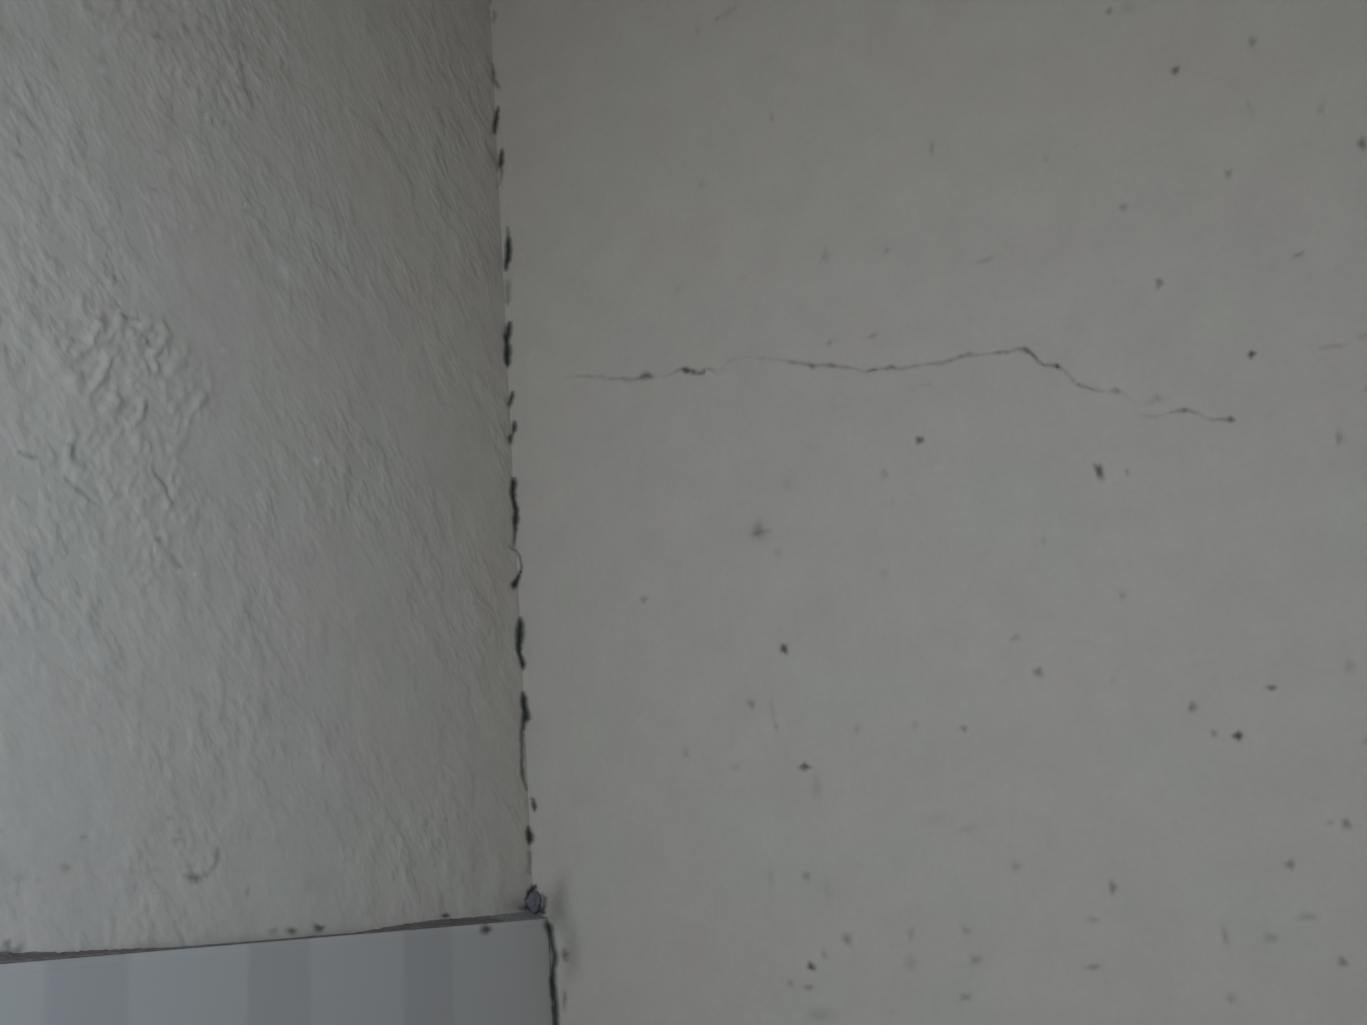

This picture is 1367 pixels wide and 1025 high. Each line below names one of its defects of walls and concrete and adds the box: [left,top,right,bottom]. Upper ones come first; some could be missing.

crack [494,109,503,167]
crack [504,237,512,268]
crack [504,323,516,441]
crack [510,479,518,532]
crack [516,620,529,729]
crack [522,769,536,843]